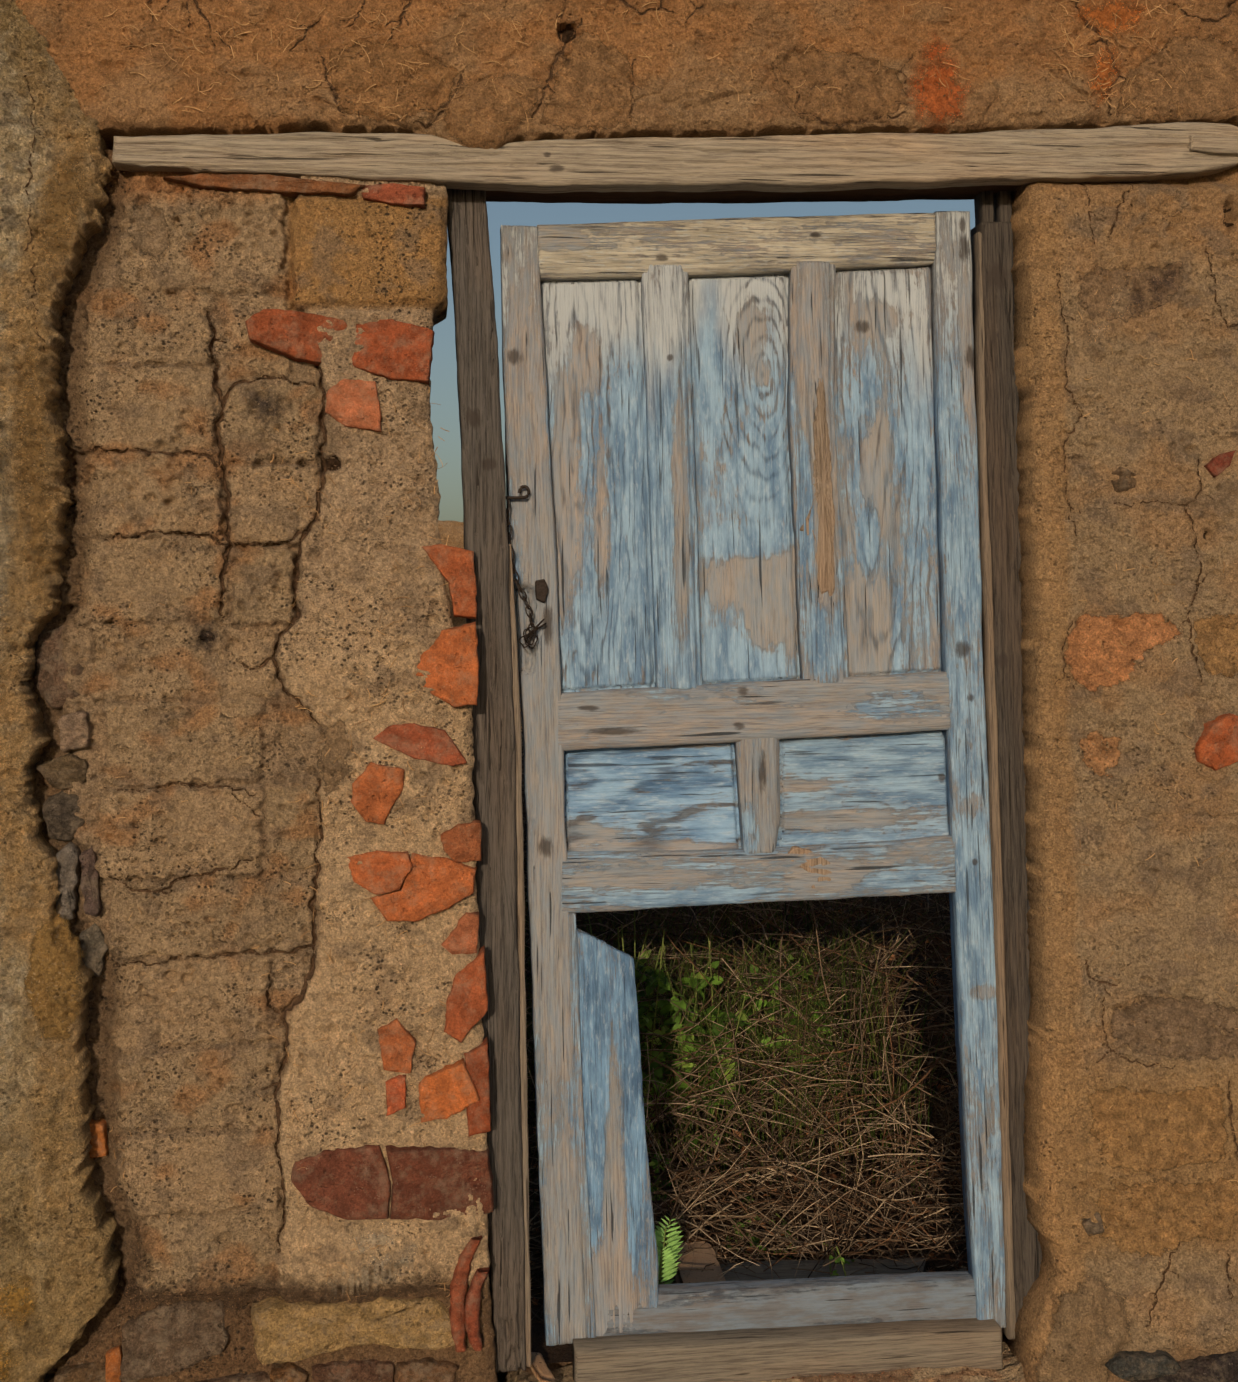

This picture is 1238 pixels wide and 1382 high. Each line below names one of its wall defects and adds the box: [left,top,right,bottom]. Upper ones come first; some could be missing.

crack [147,0,231,49]
crack [289,0,412,117]
crack [531,0,705,120]
crack [772,55,913,127]
crack [1075,0,1126,115]
crack [1173,0,1237,33]
crack [1078,183,1133,244]
crack [1205,248,1238,328]
crack [1057,259,1090,536]
crack [77,310,327,727]
crack [1114,459,1213,682]
crack [104,780,324,1253]